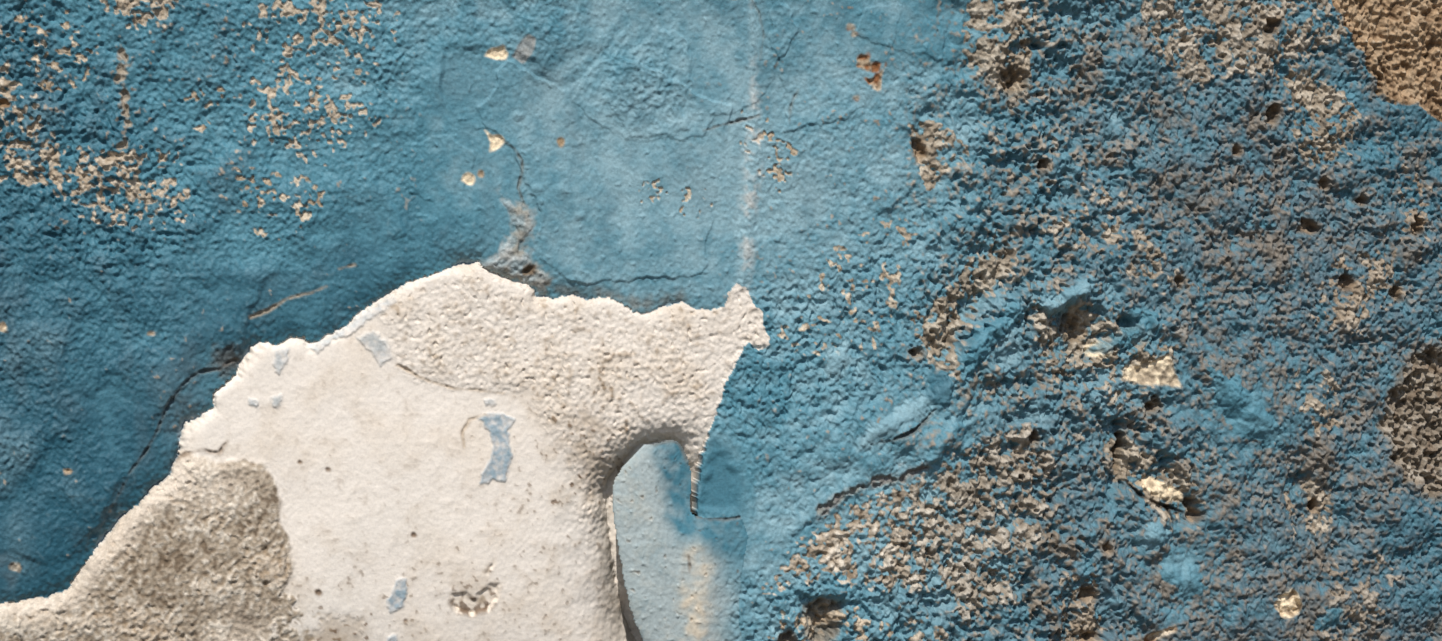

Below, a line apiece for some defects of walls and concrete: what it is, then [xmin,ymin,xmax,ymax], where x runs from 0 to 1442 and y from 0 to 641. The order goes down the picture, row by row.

peeling [0,11,195,241]
peeling [184,0,401,241]
spalling [1141,0,1442,169]
crack [101,368,229,527]
flaking render [0,263,842,641]
peeling [762,423,1058,641]
peeling [808,244,1019,383]
peeling [1028,295,1181,408]
peeling [1103,438,1206,523]
peeling [1274,551,1405,641]
peeling [1309,164,1433,335]
spalling [1376,344,1442,502]